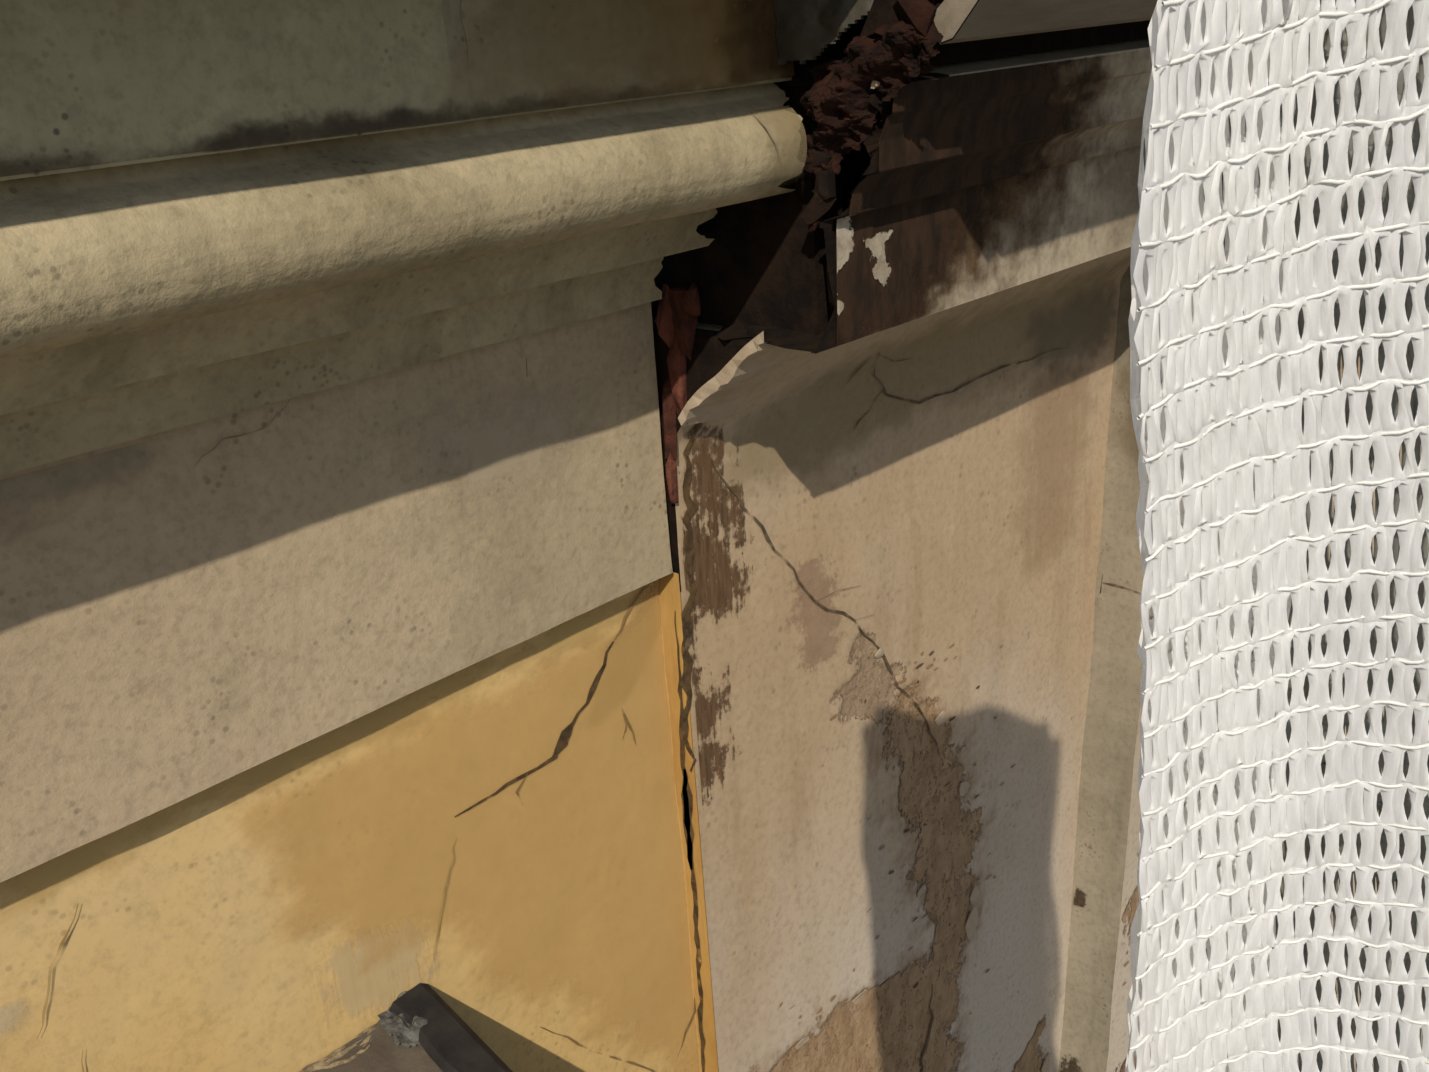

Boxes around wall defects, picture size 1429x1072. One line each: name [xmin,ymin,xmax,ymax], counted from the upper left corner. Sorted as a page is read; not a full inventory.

spalling [800,0,944,286]
water stain [836,56,1109,346]
spalling [656,283,796,504]
crack [847,347,1070,431]
crack [1100,574,1140,593]
crack [37,903,79,1039]
crack [435,584,649,941]
crack [540,1027,654,1072]
crack [674,423,944,1072]
flaking render [770,629,1009,1072]
flaking render [1012,1013,1051,1072]
flaking render [1122,886,1139,986]